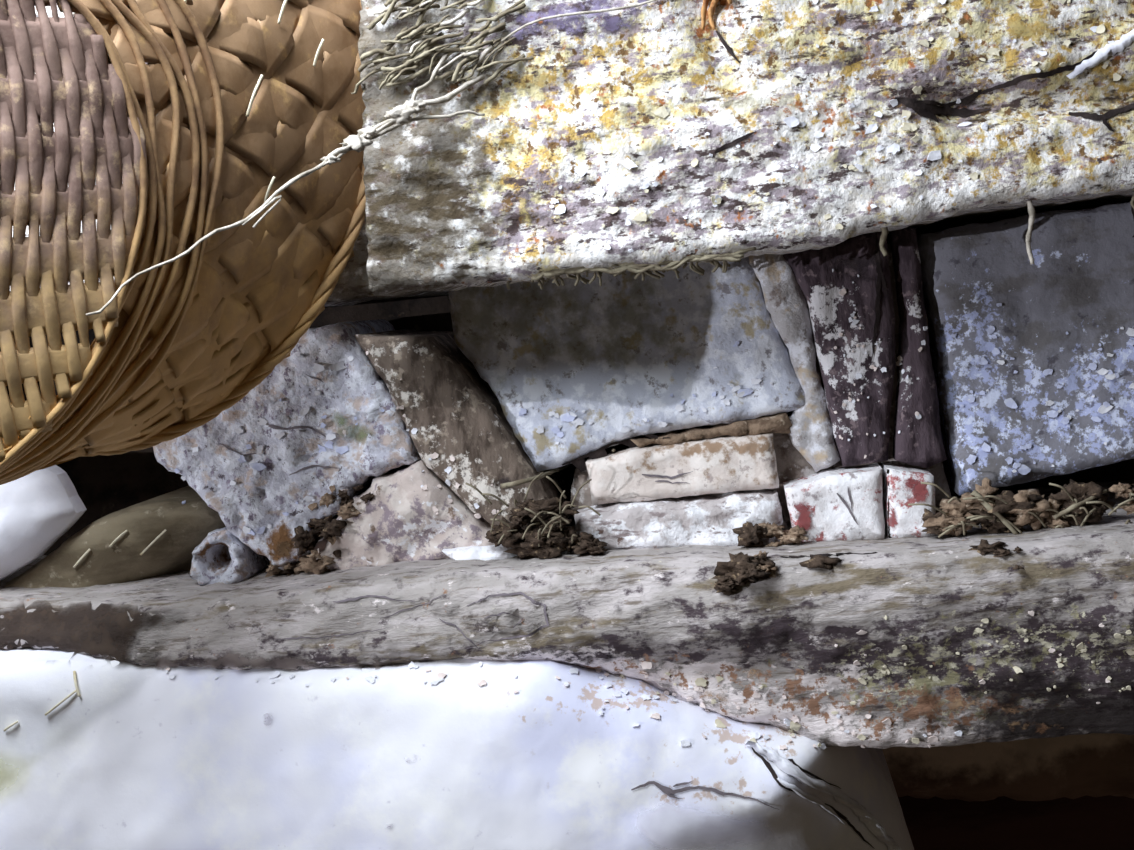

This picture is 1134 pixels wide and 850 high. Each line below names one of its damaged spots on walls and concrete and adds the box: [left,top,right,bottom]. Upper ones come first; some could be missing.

crack [891,29,1134,122]
crack [1068,103,1134,132]